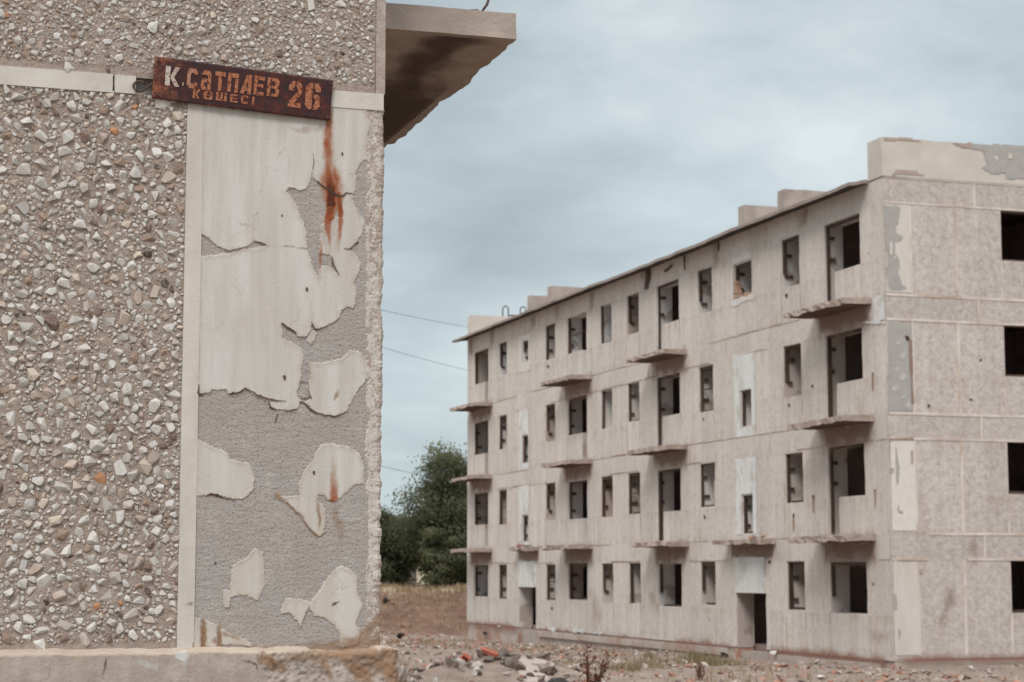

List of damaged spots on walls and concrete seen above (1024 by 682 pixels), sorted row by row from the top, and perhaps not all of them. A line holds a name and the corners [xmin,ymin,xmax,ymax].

leakage [383,37,486,143]
corrosion [322,112,343,240]
peeling [953,142,1024,179]
peeling [884,204,907,290]
peeling [194,110,385,650]